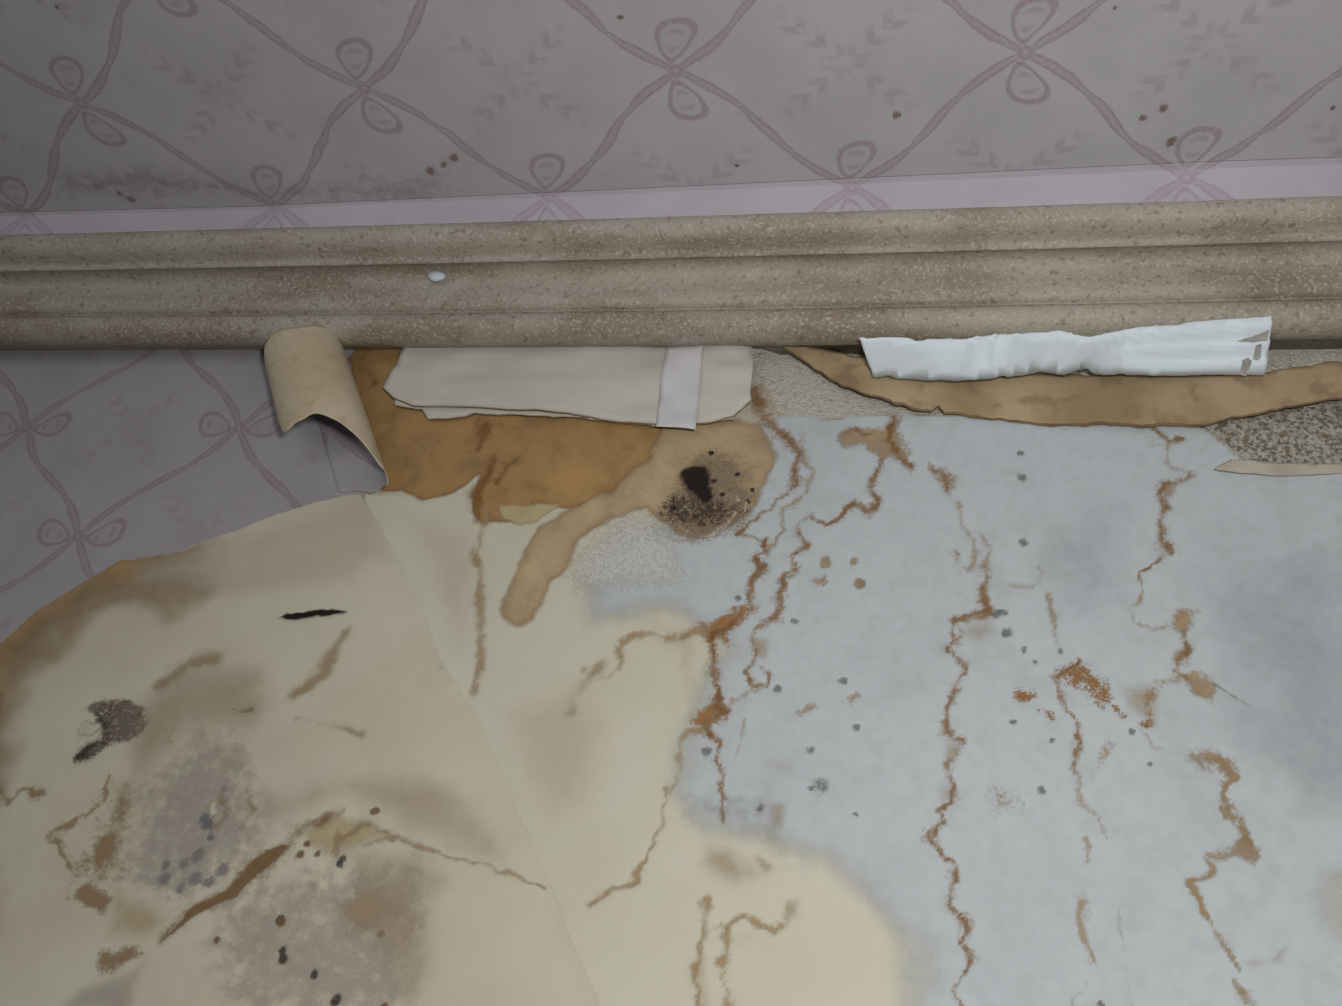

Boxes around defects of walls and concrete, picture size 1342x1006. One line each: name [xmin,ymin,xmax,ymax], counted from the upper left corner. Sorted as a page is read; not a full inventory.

peeling [1209,402,1342,477]
leakage [0,787,45,805]
leakage [47,775,128,912]
leakage [73,699,148,763]
leakage [0,528,351,722]
leakage [140,747,333,943]
leakage [348,349,1342,1006]
leakage [98,947,141,970]
leakage [213,873,414,1006]